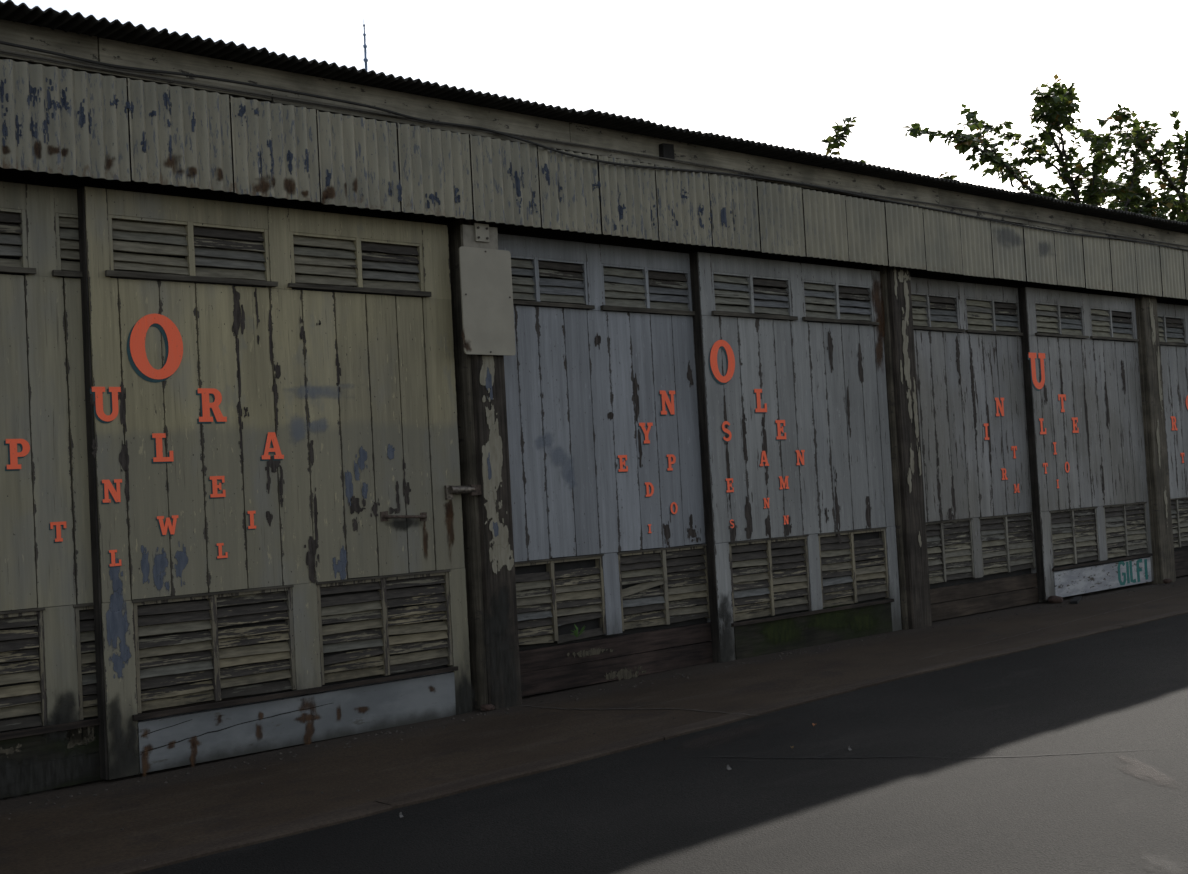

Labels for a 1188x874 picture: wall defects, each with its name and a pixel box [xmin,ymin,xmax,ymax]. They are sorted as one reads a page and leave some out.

peeling [0,78,92,147]
corrosion [34,142,67,158]
corrosion [165,155,197,176]
corrosion [255,176,308,196]
peeling [258,129,310,180]
corrosion [322,177,358,204]
peeling [894,266,922,493]
peeling [345,446,380,531]
peeling [480,355,514,574]
peeling [141,542,188,591]
peeling [106,558,132,679]
corrosion [296,698,320,744]